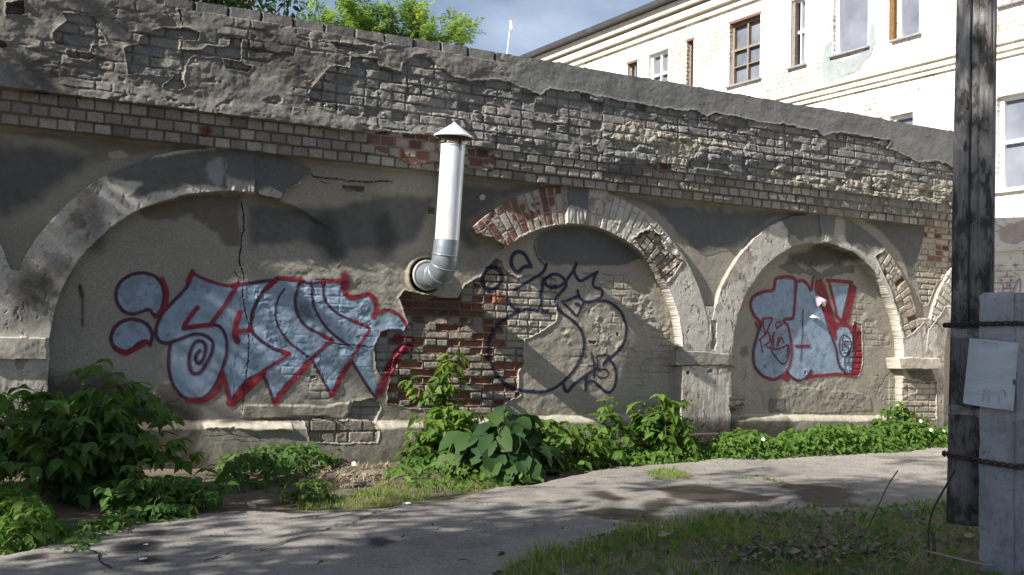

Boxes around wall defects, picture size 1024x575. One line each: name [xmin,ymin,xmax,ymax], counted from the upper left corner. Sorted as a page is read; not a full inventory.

spalling [53,13,108,61]
spalling [124,27,252,90]
spalling [308,41,953,202]
crack [203,201,349,442]
crack [312,175,391,184]
spalling [201,258,558,443]
spalling [471,184,570,247]
spalling [588,197,683,283]
spalling [876,226,952,337]